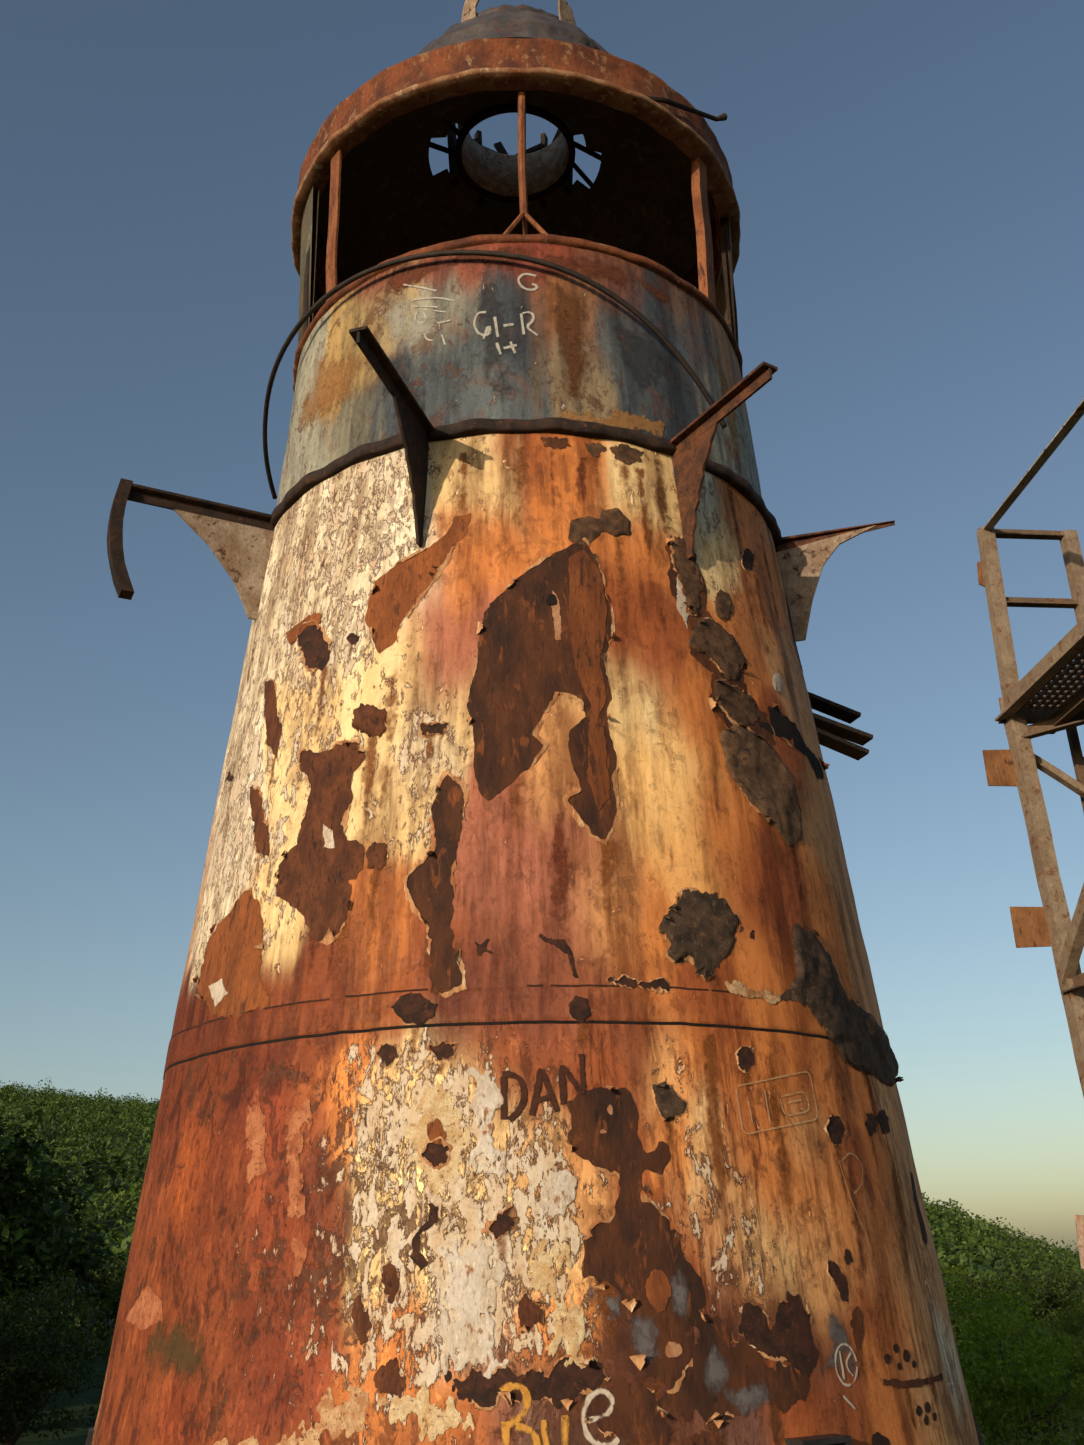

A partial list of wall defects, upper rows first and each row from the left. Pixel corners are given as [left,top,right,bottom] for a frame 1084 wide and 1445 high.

rust [300,356,359,424]
rust [388,247,670,437]
rust [458,453,467,509]
rust [576,458,586,499]
rust [636,460,667,549]
peeling [403,537,620,998]
peeling [275,737,369,964]
peeling [193,888,270,1018]
spalling [375,1043,399,1068]
peeling [401,1040,511,1197]
rust [704,1035,726,1198]
peeling [277,1086,818,1445]